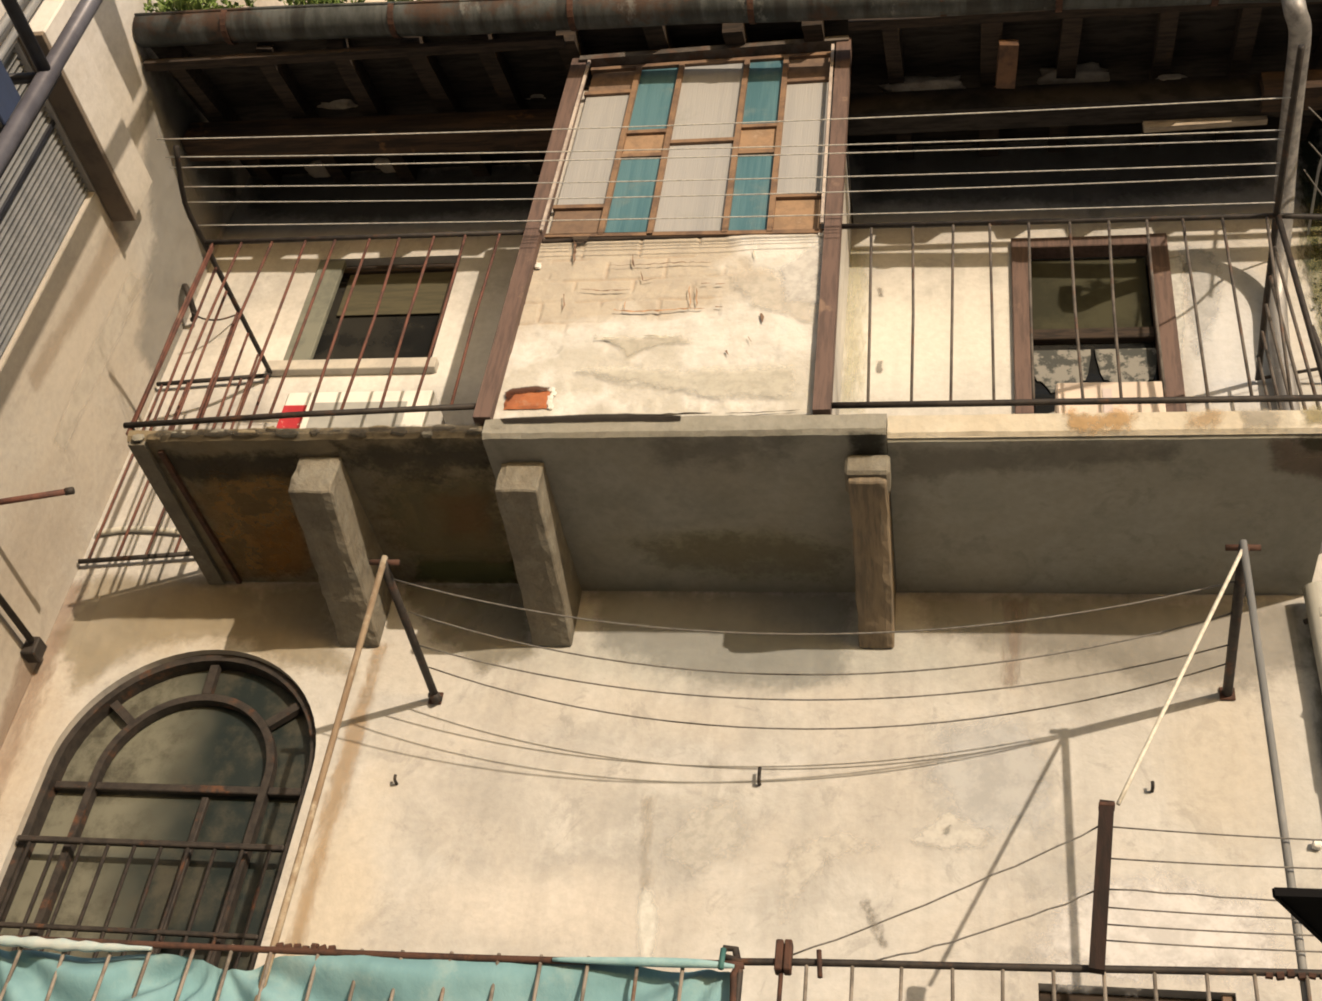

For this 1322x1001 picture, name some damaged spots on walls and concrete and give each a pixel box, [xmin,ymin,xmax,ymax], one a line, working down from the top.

spalling [503,386,557,410]
rust [1068,408,1132,433]
water stain [1272,436,1322,477]
rust [156,453,310,580]
water stain [407,583,531,667]